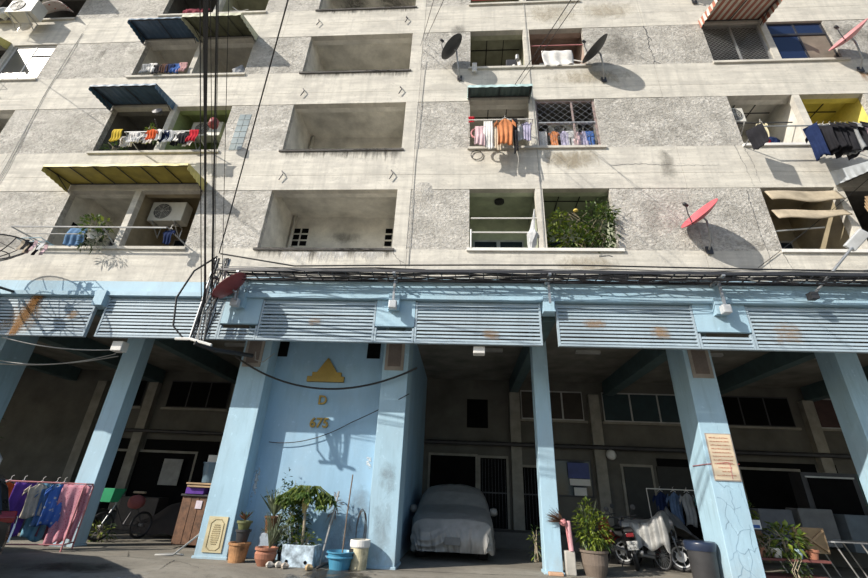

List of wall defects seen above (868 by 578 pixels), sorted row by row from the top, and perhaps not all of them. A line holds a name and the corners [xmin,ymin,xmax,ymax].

rust [9,296,43,334]
crack [717,482,758,578]